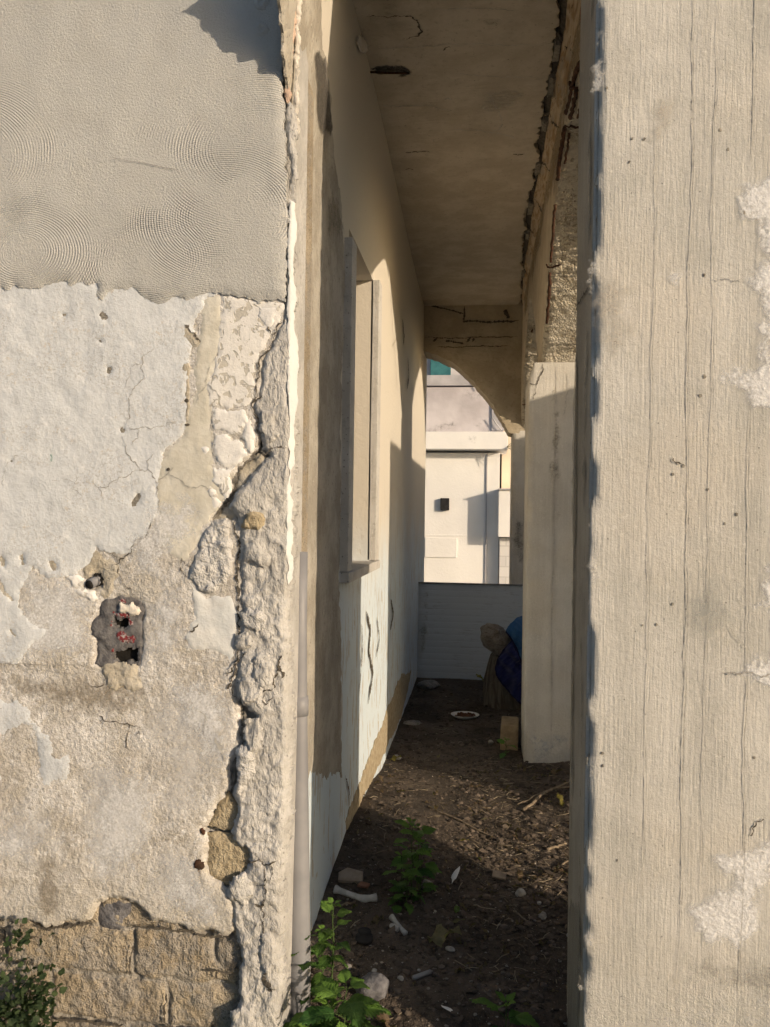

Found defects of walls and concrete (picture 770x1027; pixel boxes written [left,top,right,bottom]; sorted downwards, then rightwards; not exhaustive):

spalling [521,0,581,324]
crack [431,305,519,348]
damp [721,179,770,407]
peeling [157,295,285,570]
spalling [68,550,120,602]
crack [52,320,285,792]
crack [359,600,394,703]
damp [745,660,770,685]
peeling [243,718,263,754]
spalling [207,791,254,906]
crack [249,859,276,934]
damp [690,842,770,946]